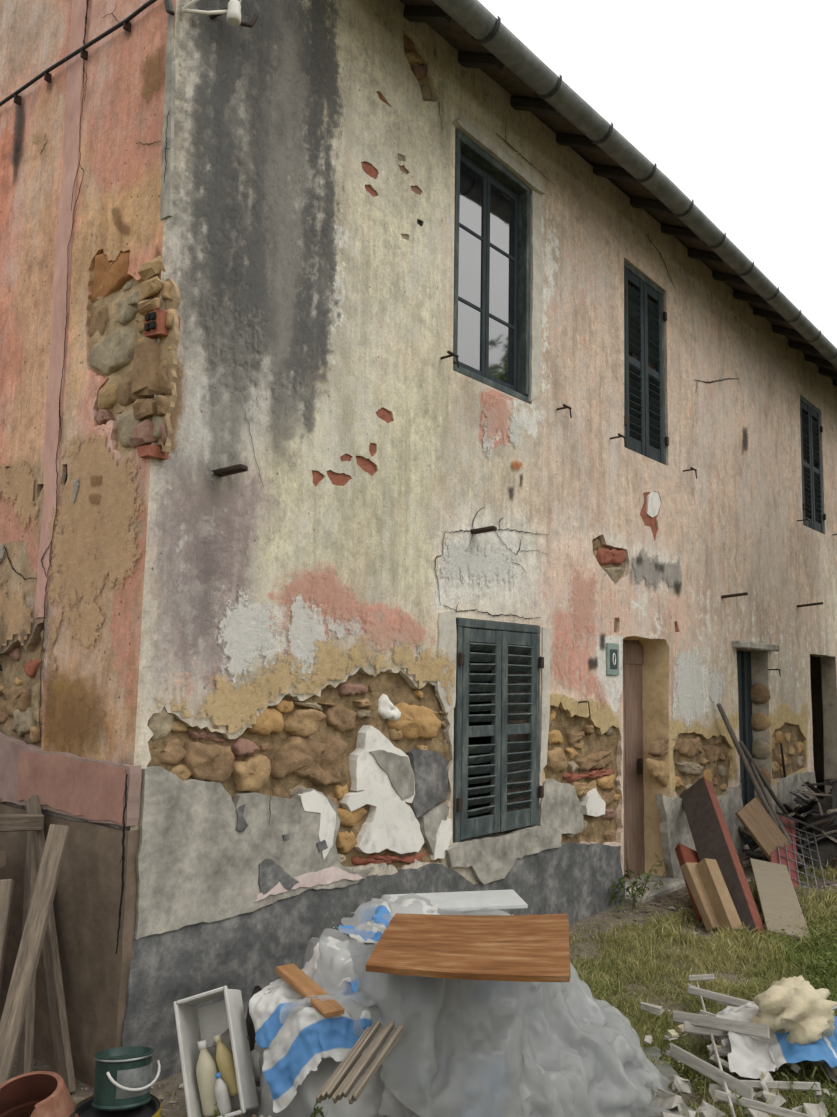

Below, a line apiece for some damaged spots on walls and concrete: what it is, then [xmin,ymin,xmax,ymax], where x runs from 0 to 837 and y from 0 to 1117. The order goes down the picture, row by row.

spalling [403,34,433,102]
water stain [141,0,342,489]
crack [3,0,123,738]
spalling [0,251,181,747]
spalling [312,443,377,487]
crack [435,507,548,619]
peeling [551,536,682,708]
spalling [640,491,661,540]
spalling [147,589,455,902]
spalling [543,706,621,844]
spalling [646,645,730,798]
spalling [771,722,804,779]